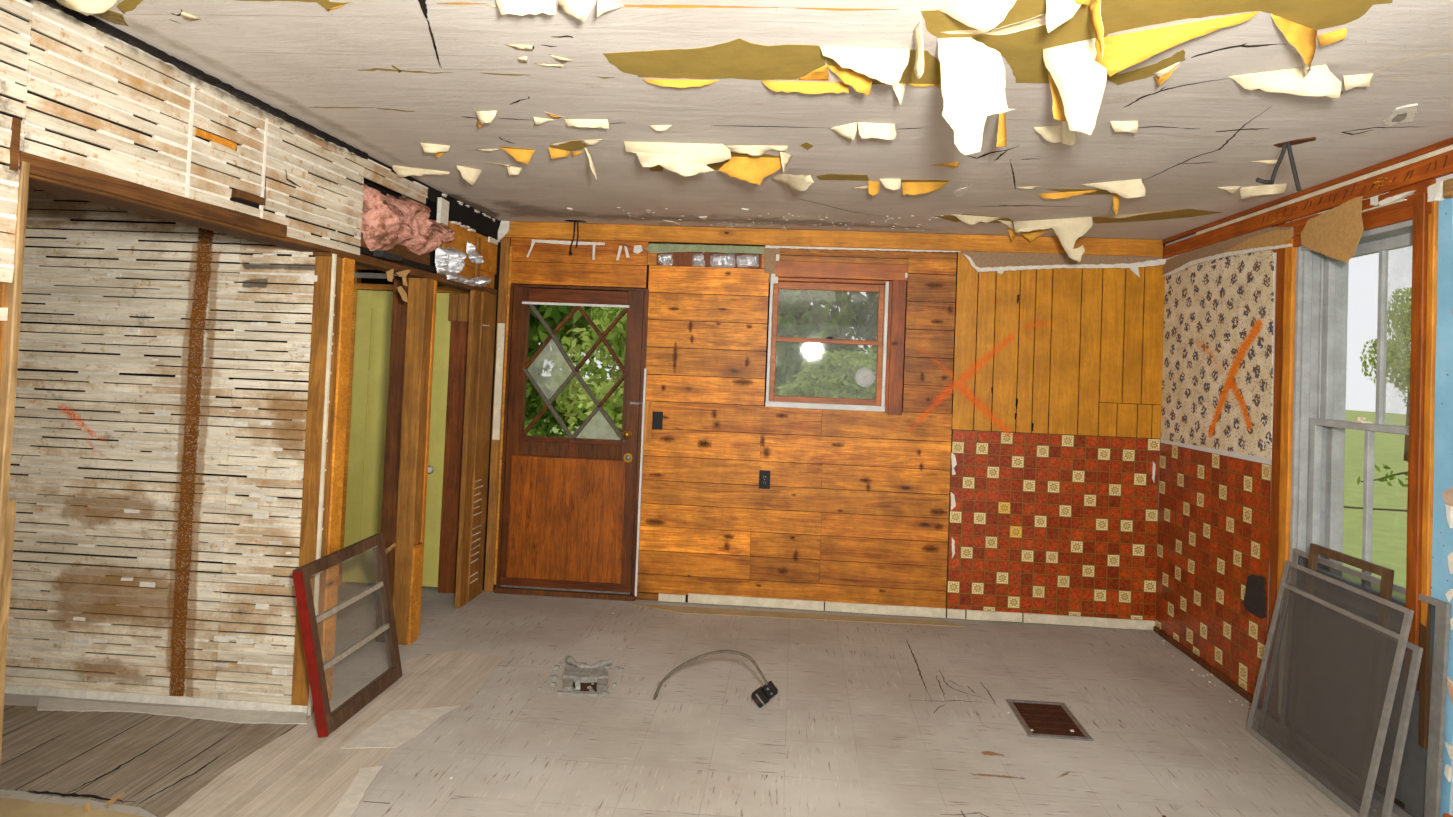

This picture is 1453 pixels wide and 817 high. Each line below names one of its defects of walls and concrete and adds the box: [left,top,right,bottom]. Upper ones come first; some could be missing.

crack [623,4,899,12]
crack [358,3,573,144]
crack [310,105,414,113]
crack [711,122,809,130]
crack [1125,43,1277,180]
crack [1342,126,1430,135]
flaking render [1383,103,1418,126]
spalling [364,178,488,237]
spalling [1261,155,1448,225]
peeling [1442,487,1453,528]
peeling [1445,552,1453,630]
peeling [1444,742,1453,782]